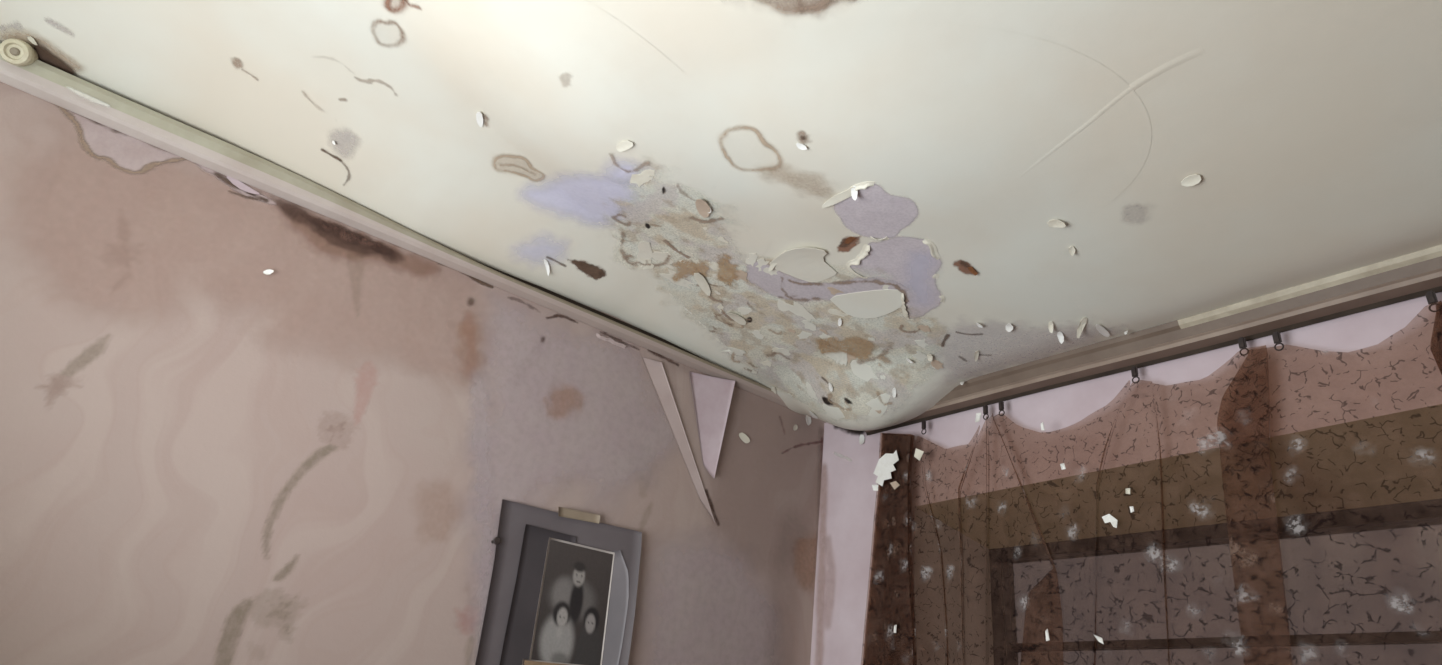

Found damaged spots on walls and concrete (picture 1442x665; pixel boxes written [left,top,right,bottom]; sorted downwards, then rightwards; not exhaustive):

damp [376,0,420,40]
damp [763,0,836,13]
damp [57,105,185,174]
damp [494,155,545,181]
damp [722,127,781,171]
spalling [796,132,807,150]
damp [280,203,401,261]
peeling [610,140,983,431]
peeling [1048,317,1128,344]